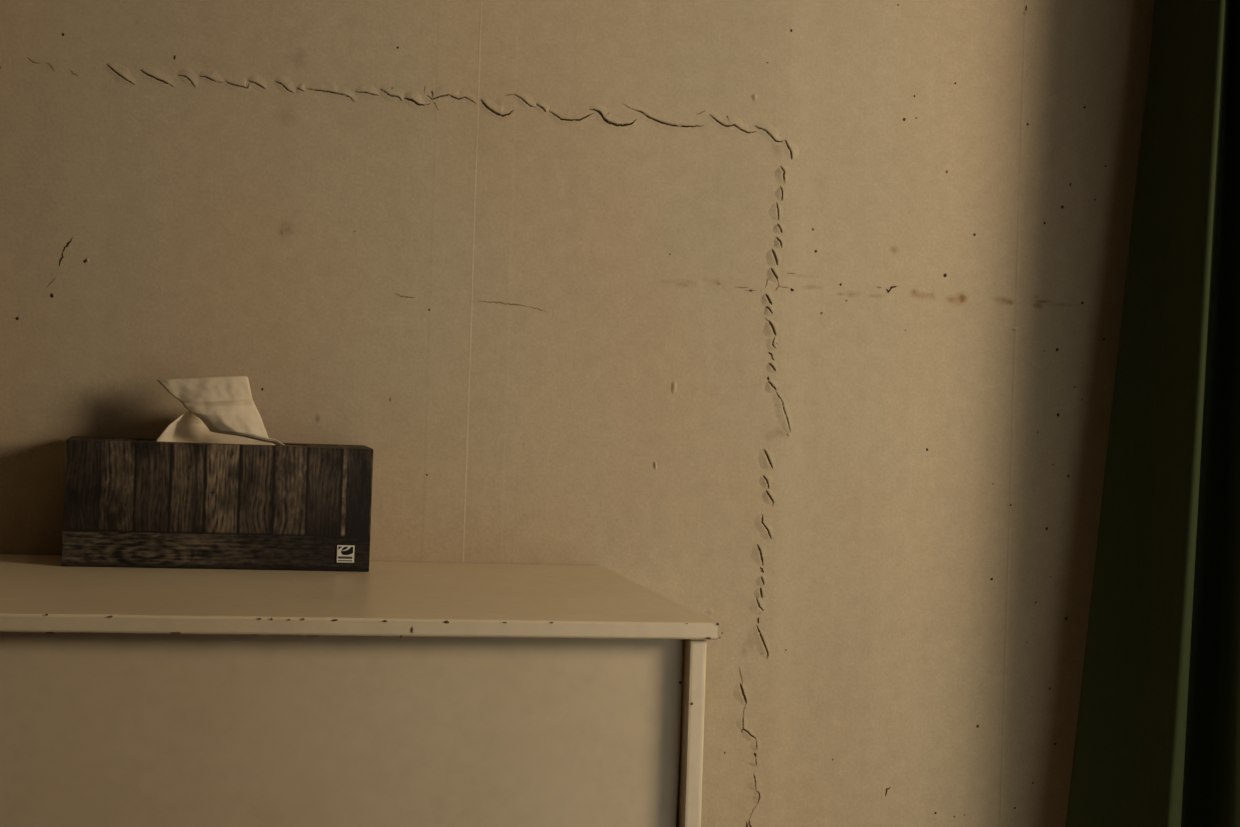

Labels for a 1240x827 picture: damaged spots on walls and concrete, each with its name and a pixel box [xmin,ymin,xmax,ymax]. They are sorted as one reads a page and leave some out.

crack [1,58,800,827]